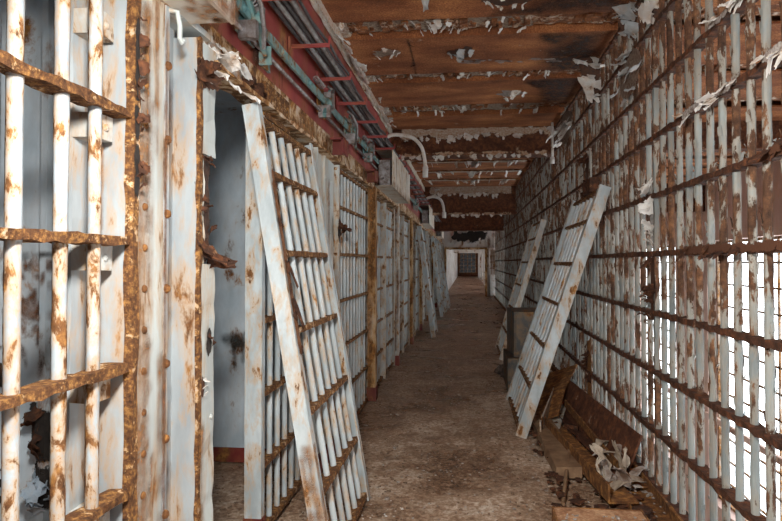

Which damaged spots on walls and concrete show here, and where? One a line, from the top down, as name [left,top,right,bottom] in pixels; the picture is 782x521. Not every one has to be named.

rust [140,1,171,215]
peeling [194,40,267,104]
peeling [315,0,572,199]
peeling [573,0,667,107]
peeling [577,153,589,197]
peeling [338,217,352,242]
rust [158,346,166,449]
peeling [19,402,50,515]